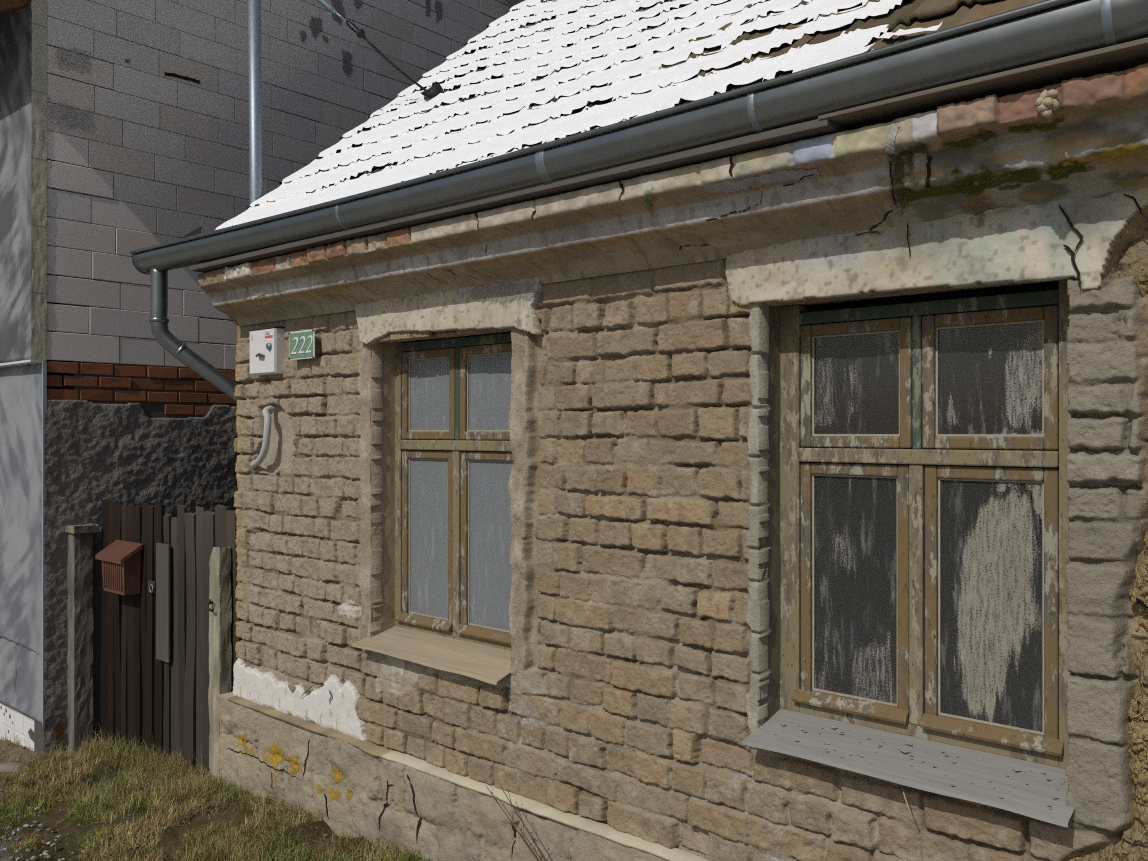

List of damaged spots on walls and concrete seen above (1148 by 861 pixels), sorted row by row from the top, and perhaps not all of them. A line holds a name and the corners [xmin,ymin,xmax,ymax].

crack [856,123,910,258]
damp [888,144,928,207]
crack [924,157,932,188]
crack [1059,205,1083,287]
spalling [1118,228,1148,306]
crack [1123,194,1148,223]
spalling [1066,531,1148,861]